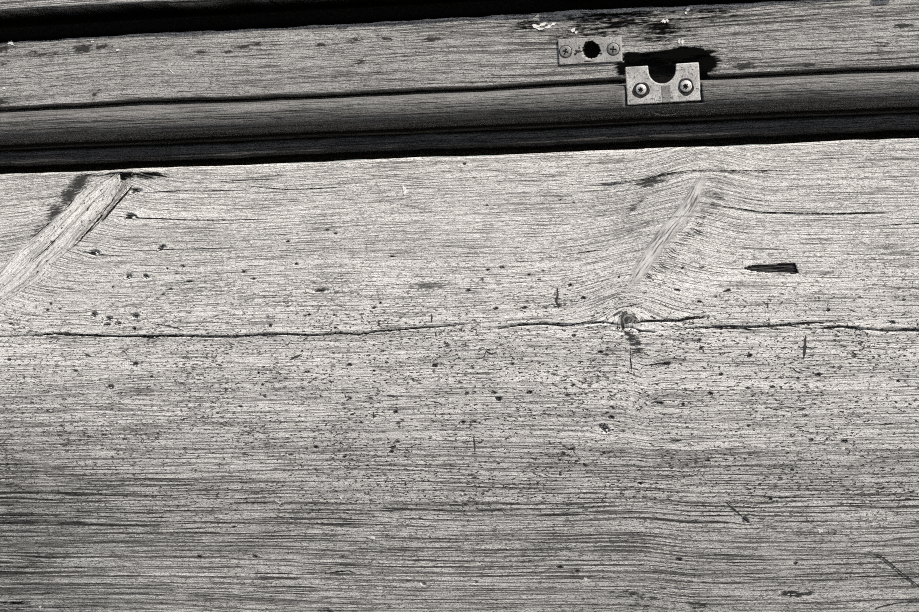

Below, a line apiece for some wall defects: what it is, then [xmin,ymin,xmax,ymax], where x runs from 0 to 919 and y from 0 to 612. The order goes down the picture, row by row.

crack [587,170,791,185]
crack [646,197,919,279]
crack [0,302,919,371]